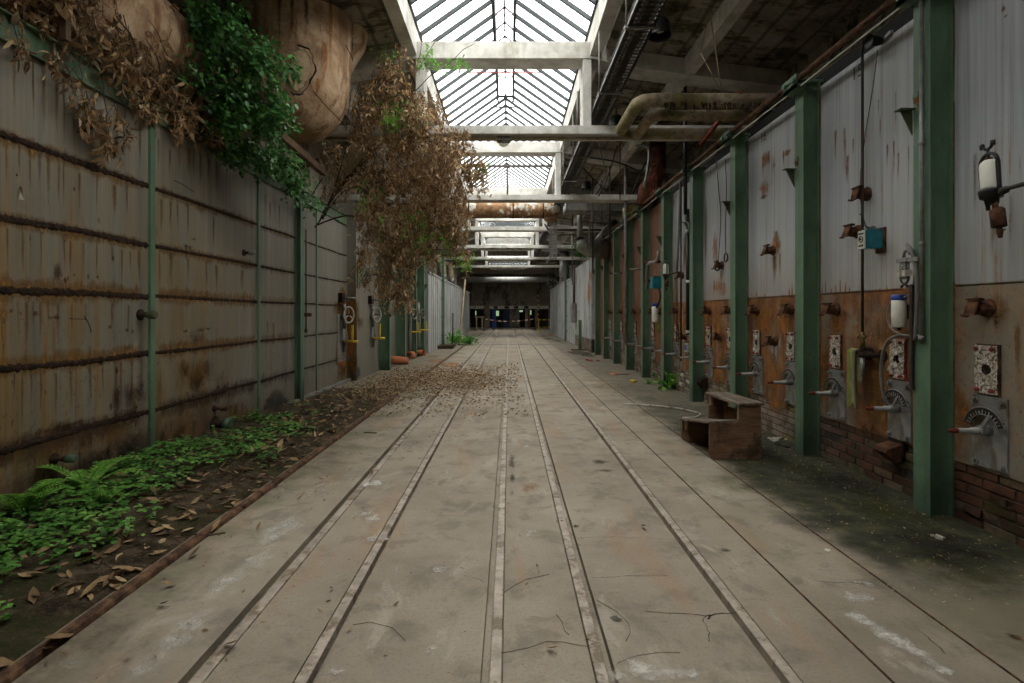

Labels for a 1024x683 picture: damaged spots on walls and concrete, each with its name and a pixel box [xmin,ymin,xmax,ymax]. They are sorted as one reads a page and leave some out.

rust [0,130,347,256]
rust [0,213,362,466]
crack [647,611,731,642]